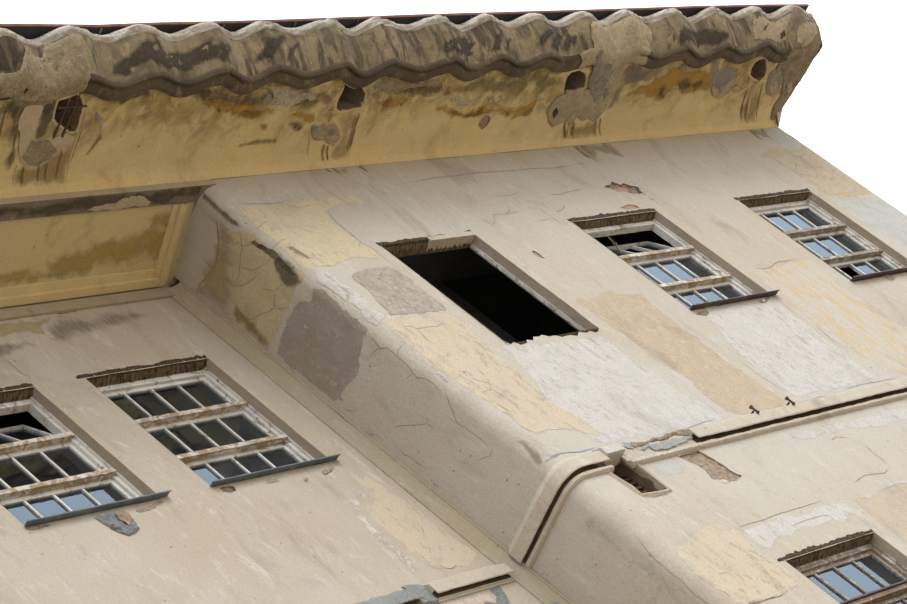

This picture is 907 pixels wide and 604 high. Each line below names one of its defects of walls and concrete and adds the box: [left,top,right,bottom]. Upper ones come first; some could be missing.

spalling [0,33,91,167]
peeling [334,78,442,113]
spalling [520,16,653,128]
spalling [749,6,821,120]
water stain [0,188,238,303]
crack [198,194,387,320]
spalling [605,182,663,204]
water stain [235,309,264,342]
crack [371,323,492,461]
spalling [95,501,164,536]
spalling [678,450,742,483]
spalling [447,594,494,604]